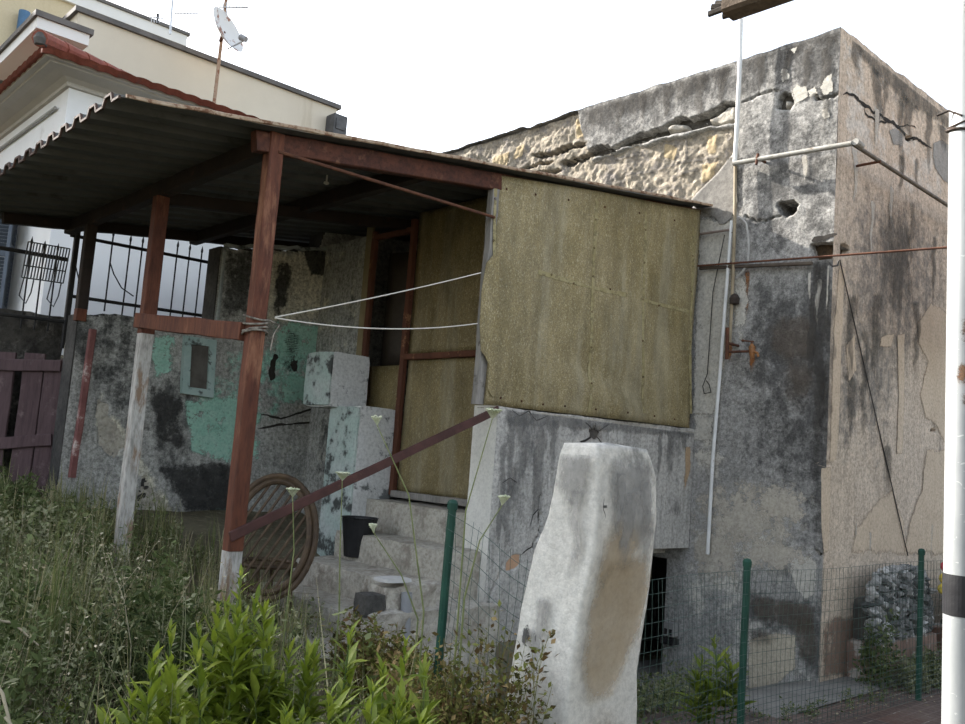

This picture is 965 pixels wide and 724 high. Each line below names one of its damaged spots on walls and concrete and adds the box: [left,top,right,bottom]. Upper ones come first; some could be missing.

peeling [781,68,833,119]
crack [818,92,932,148]
spalling [450,115,735,200]
damp [273,262,292,318]
damp [305,250,326,276]
corrosion [957,364,965,383]
damp [151,386,183,448]
damp [159,462,230,511]
crack [522,496,540,554]
damp [585,462,653,696]